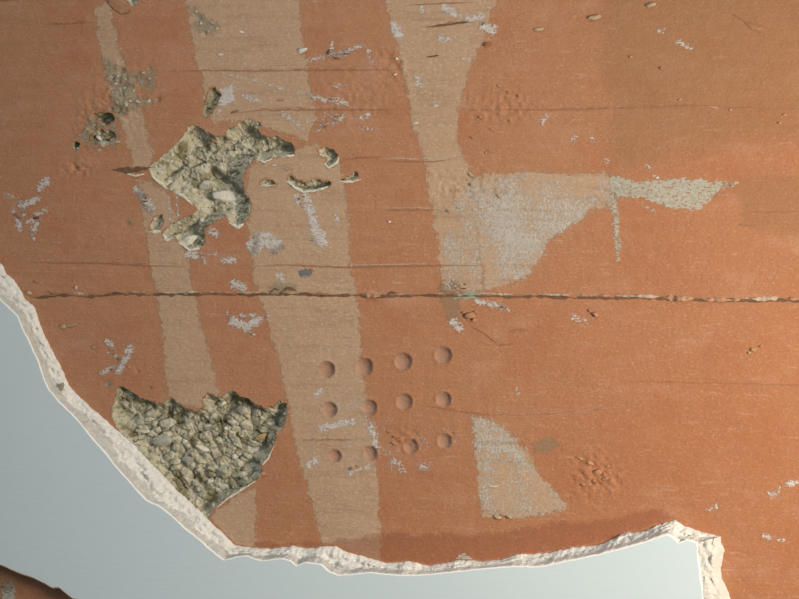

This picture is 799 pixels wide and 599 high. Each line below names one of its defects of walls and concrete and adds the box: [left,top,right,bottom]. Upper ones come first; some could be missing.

peeling [202,87,221,118]
spalling [89,112,116,147]
peeling [318,146,340,169]
spalling [149,119,296,252]
peeling [286,172,361,193]
crack [265,261,484,269]
crack [32,287,799,303]
spalling [0,264,730,599]